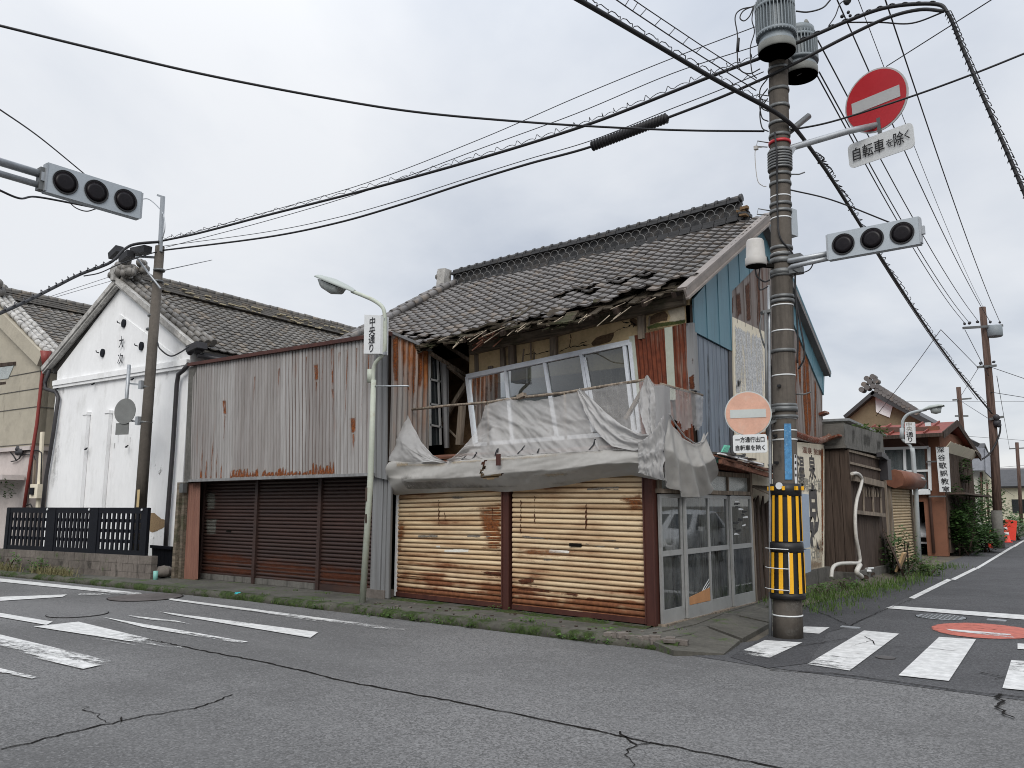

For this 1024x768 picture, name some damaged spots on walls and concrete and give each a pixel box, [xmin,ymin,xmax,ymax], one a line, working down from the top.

rust [306,348,369,444]
rust [200,446,334,478]
rust [623,496,642,509]
flaking render [150,513,165,532]
rust [481,504,501,548]